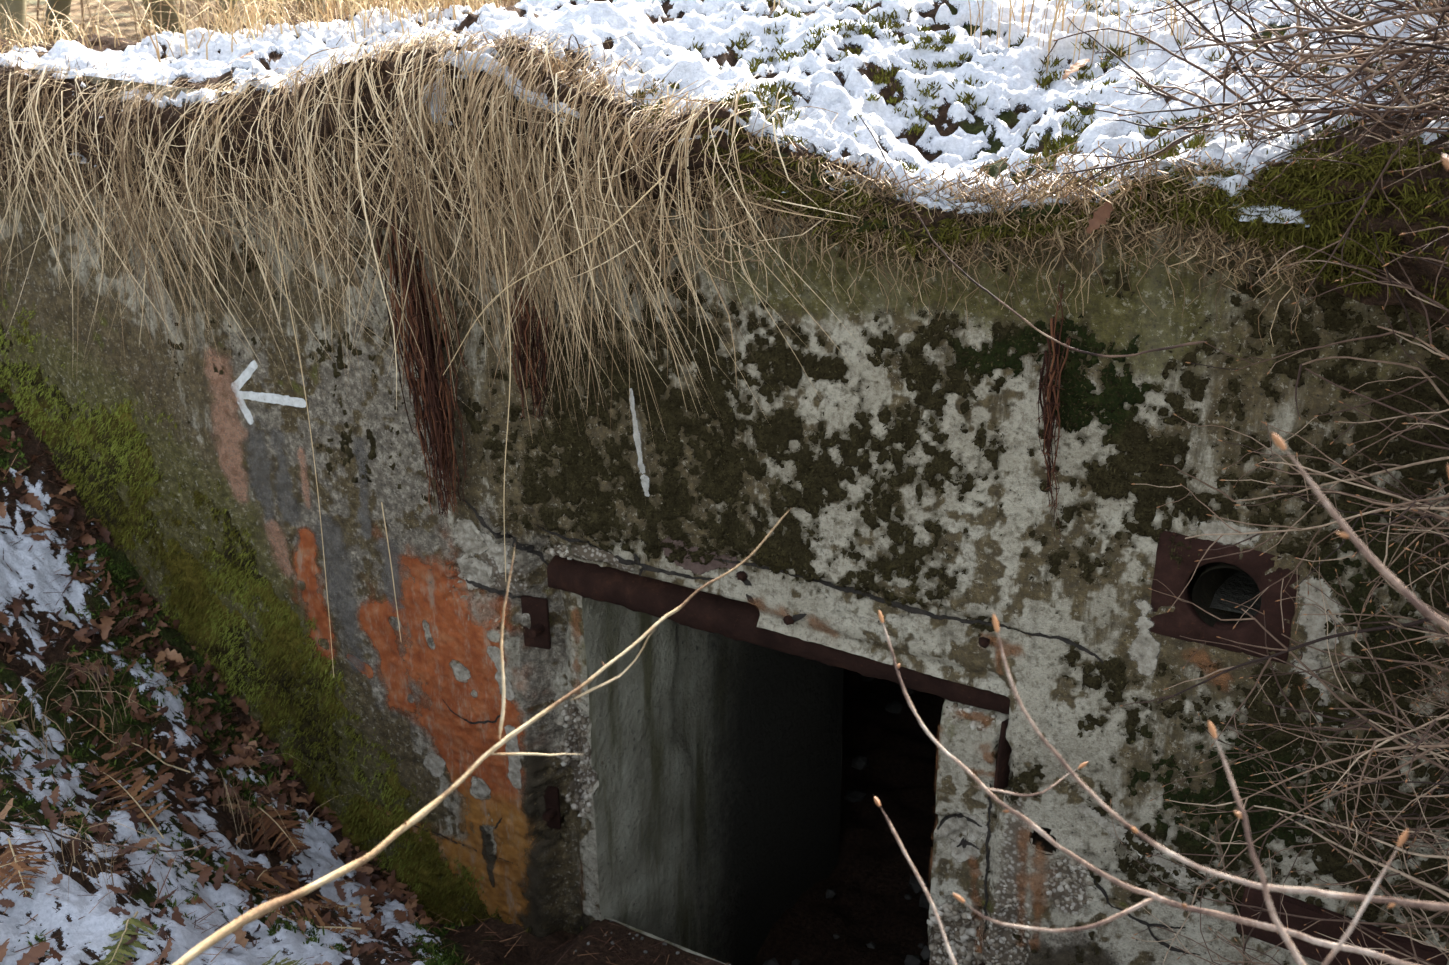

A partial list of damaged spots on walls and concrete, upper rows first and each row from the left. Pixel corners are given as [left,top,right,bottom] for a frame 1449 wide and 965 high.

corrosion [810,619,836,636]
peeling [294,528,539,928]
spalling [943,702,996,731]
spalling [935,812,988,862]
spalling [1043,856,1094,910]
spalling [927,880,1031,965]